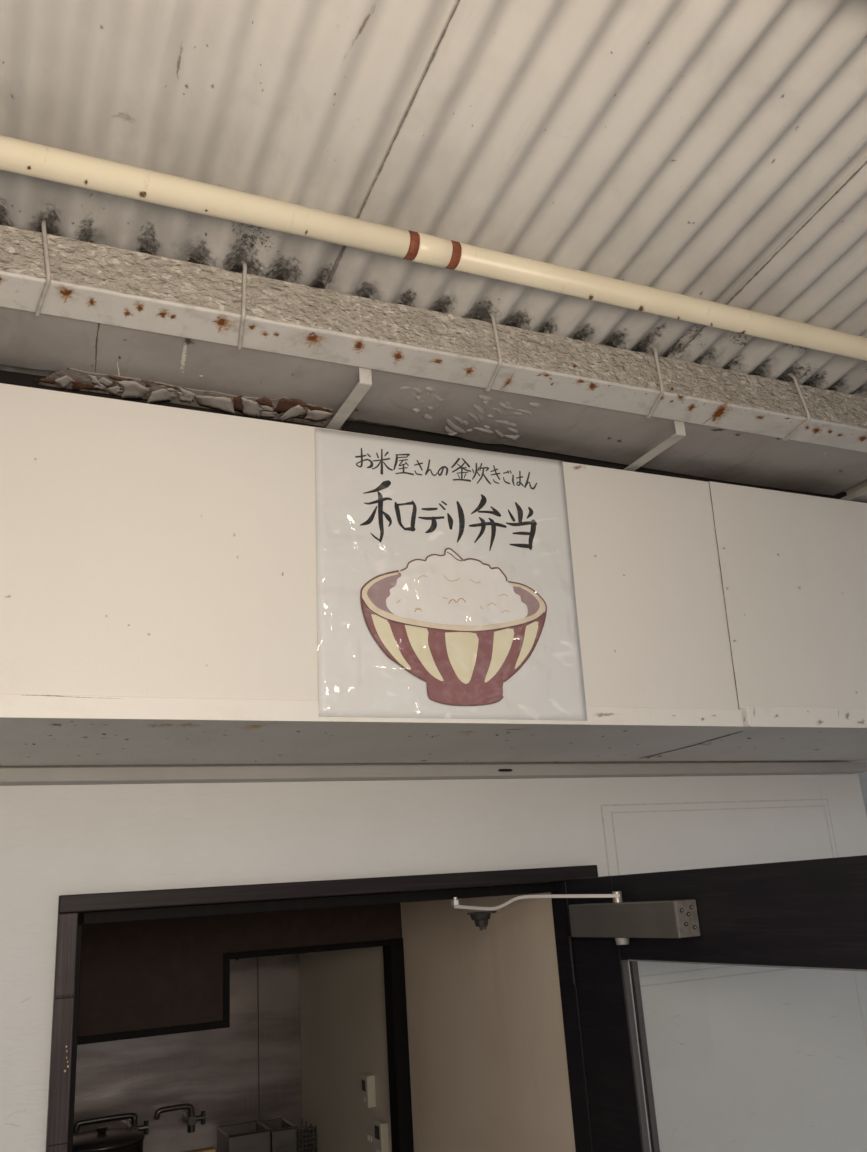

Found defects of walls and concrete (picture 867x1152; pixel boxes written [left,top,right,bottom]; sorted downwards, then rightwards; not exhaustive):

water stain [36,210,60,236]
water stain [227,220,300,281]
corrosion [403,230,420,261]
corrosion [446,240,462,270]
water stain [311,269,328,289]
peeling [0,225,867,430]
water stain [466,302,491,322]
water stain [503,313,553,333]
water stain [605,333,624,348]
water stain [633,325,664,353]
water stain [778,367,864,394]
corrosion [661,387,732,424]